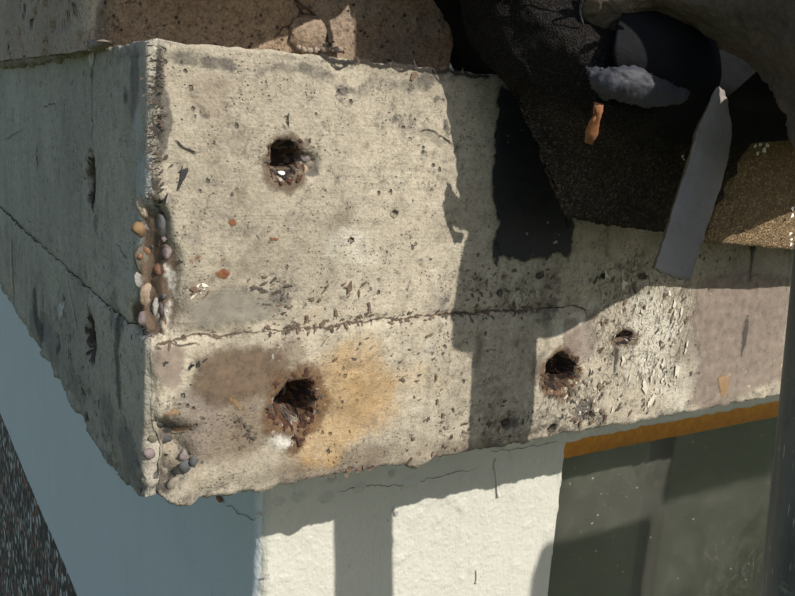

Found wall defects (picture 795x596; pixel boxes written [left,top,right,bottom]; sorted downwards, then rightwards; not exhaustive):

crack [275,0,316,37]
crack [320,33,489,82]
spalling [177,166,188,190]
spalling [131,194,183,335]
peeling [190,283,210,300]
crack [0,207,589,352]
leakage [154,347,184,386]
leakage [194,346,286,405]
peeling [404,268,693,468]
corrosion [541,348,582,399]
corrosion [266,367,323,447]